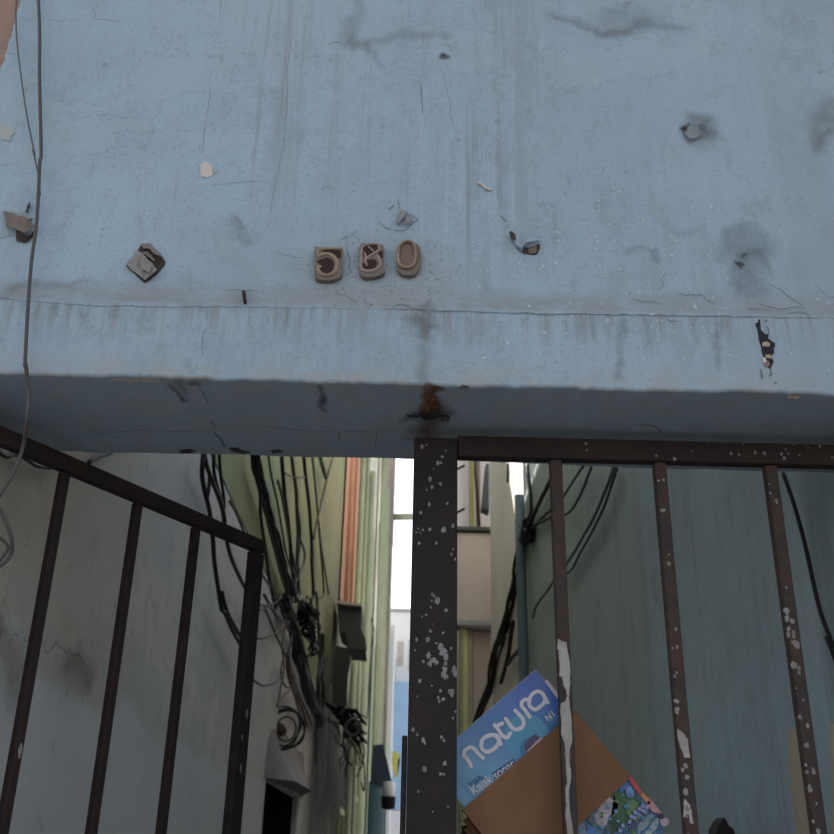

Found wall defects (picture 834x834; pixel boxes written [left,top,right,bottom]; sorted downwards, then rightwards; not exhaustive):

spalling [680,123,705,146]
peeling [755,319,777,384]
corrosion [420,384,444,438]